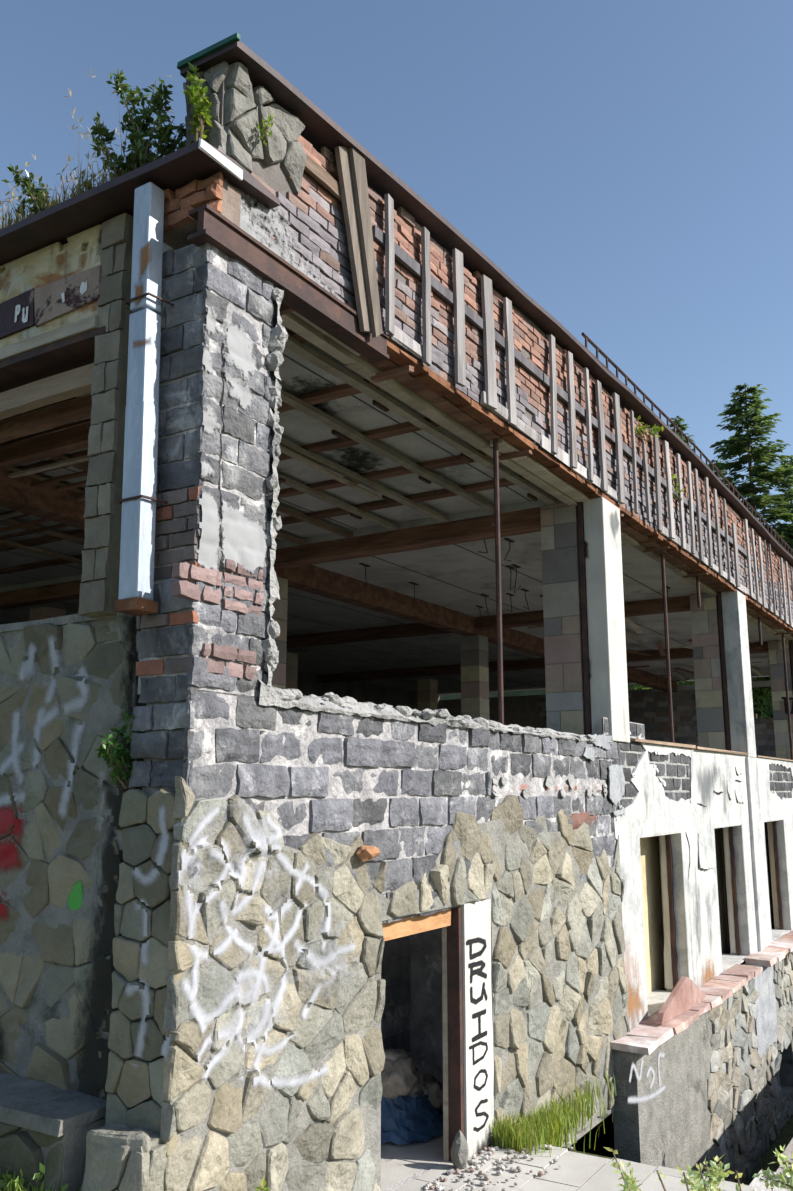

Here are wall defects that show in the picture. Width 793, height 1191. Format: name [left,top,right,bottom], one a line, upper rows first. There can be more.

spalling [171,286,288,687]
spalling [492,717,692,816]
spalling [769,763,793,800]
spalling [570,812,597,830]
corrosion [626,985,642,1018]